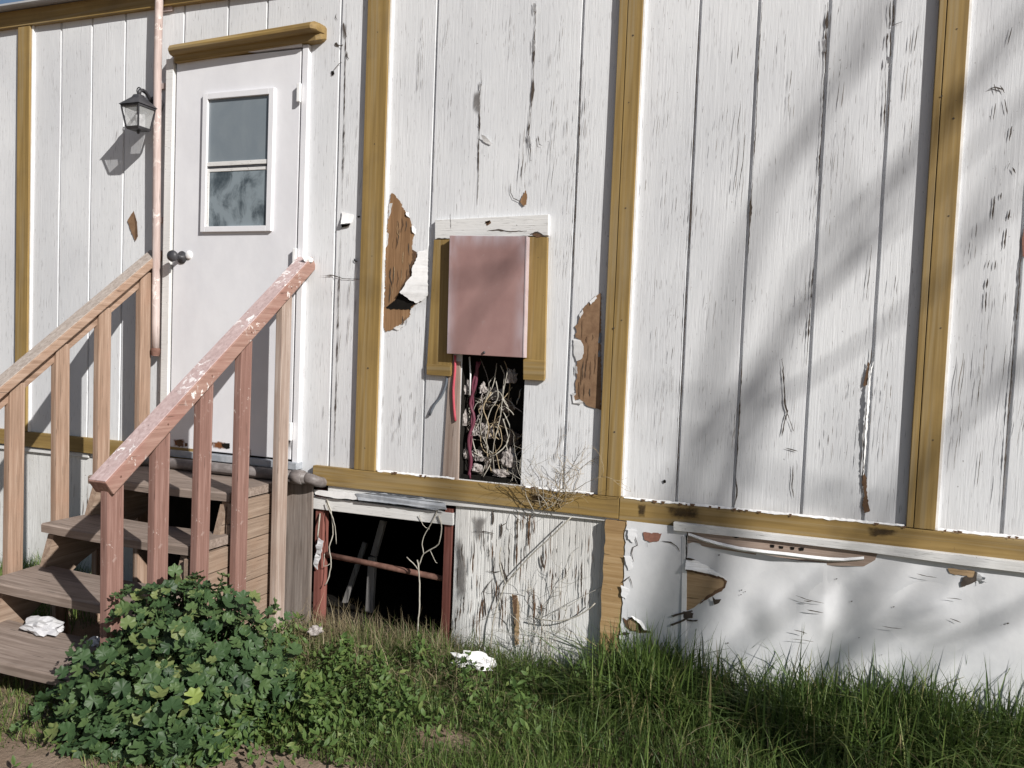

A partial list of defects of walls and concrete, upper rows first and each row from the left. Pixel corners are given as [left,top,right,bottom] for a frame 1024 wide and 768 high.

crack [474,3,590,279]
crack [812,9,872,298]
peeling [127,211,138,241]
peeling [383,193,429,332]
crack [634,2,794,505]
peeling [572,293,602,410]
crack [782,258,814,497]
peeling [621,529,662,599]
peeling [685,557,726,579]